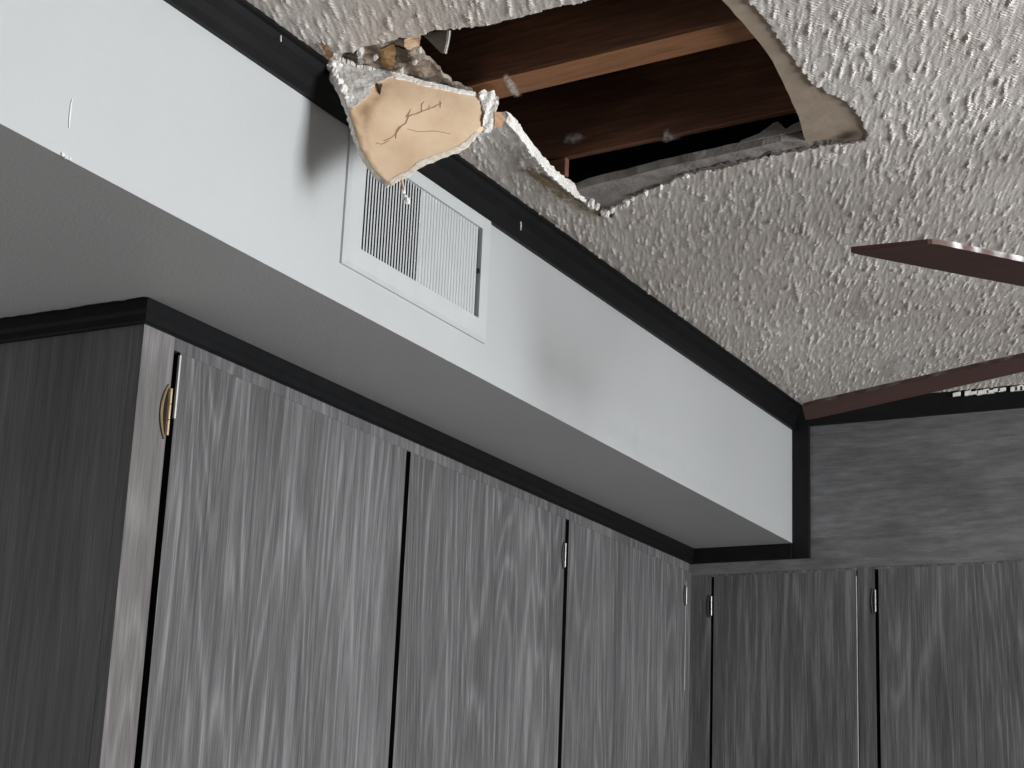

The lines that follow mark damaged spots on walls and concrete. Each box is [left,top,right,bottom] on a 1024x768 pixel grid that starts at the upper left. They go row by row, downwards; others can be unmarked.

crack [377,101,451,145]
spalling [574,0,868,218]